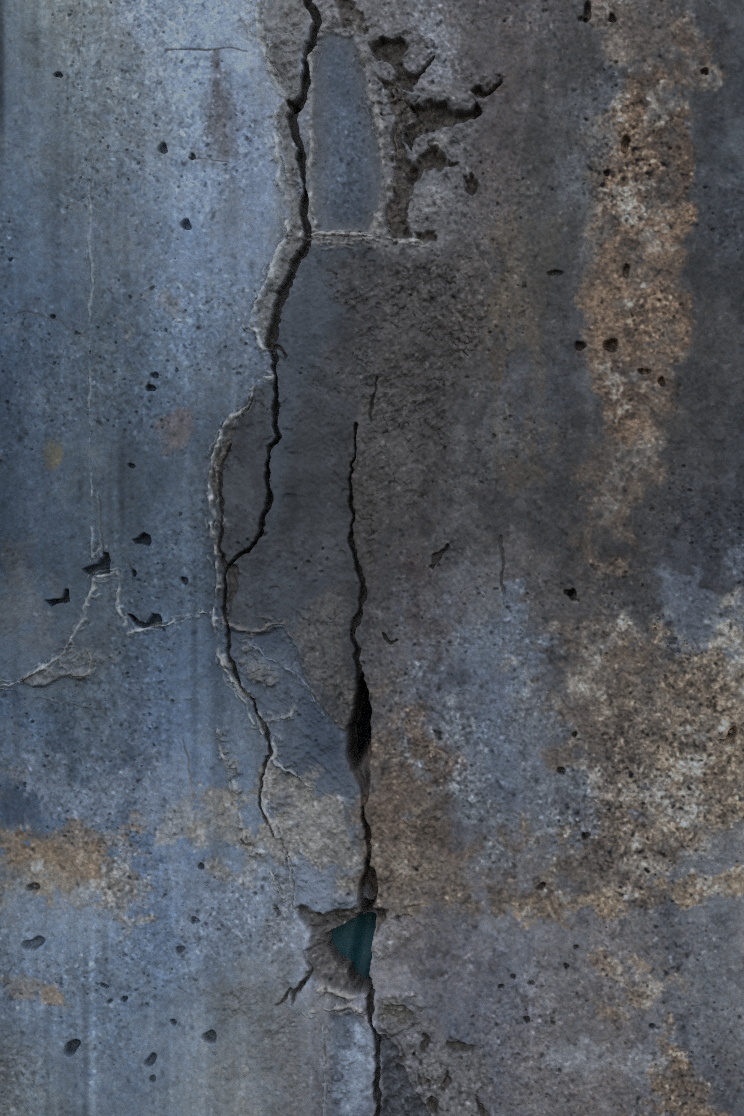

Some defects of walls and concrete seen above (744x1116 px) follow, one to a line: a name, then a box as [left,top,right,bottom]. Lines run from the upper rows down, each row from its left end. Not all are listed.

crack [166,46,249,54]
crack [217,0,322,683]
rust [480,0,731,580]
peeling [189,0,509,1116]
crack [429,543,450,570]
crack [345,376,399,914]
crack [260,729,272,789]
rust [364,584,744,935]
rust [0,810,159,941]
crack [275,988,293,1006]
crack [365,989,382,1116]